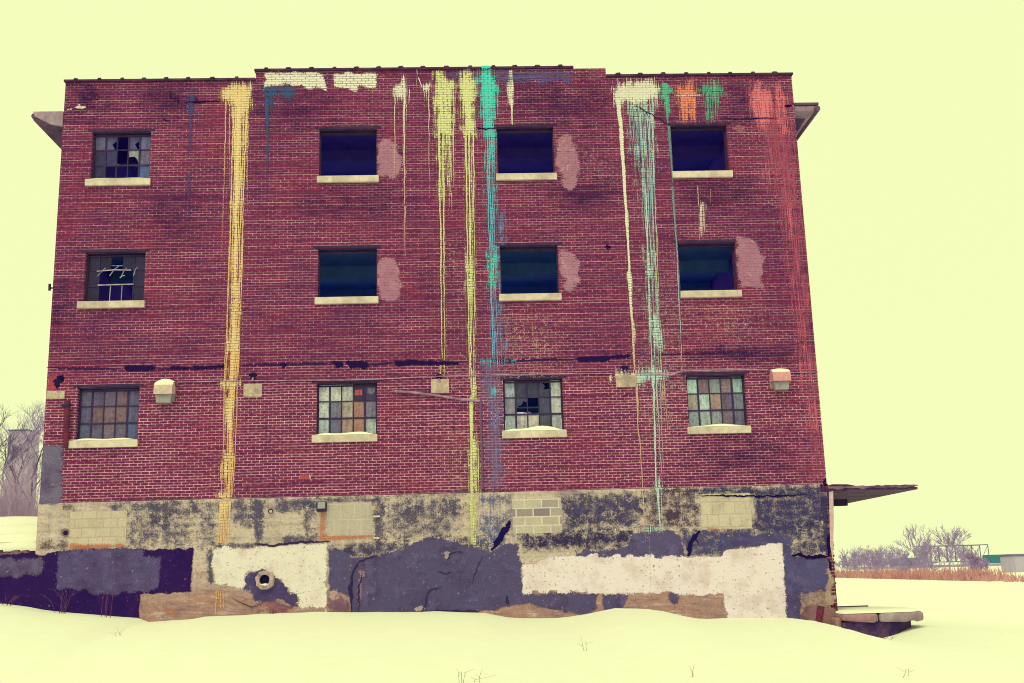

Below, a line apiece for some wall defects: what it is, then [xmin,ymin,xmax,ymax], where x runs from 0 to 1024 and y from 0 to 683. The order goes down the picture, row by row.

damp [110,77,829,615]
crack [700,492,805,500]
crack [348,556,375,612]
crack [421,521,511,612]
crack [687,530,700,556]
crack [792,551,829,559]